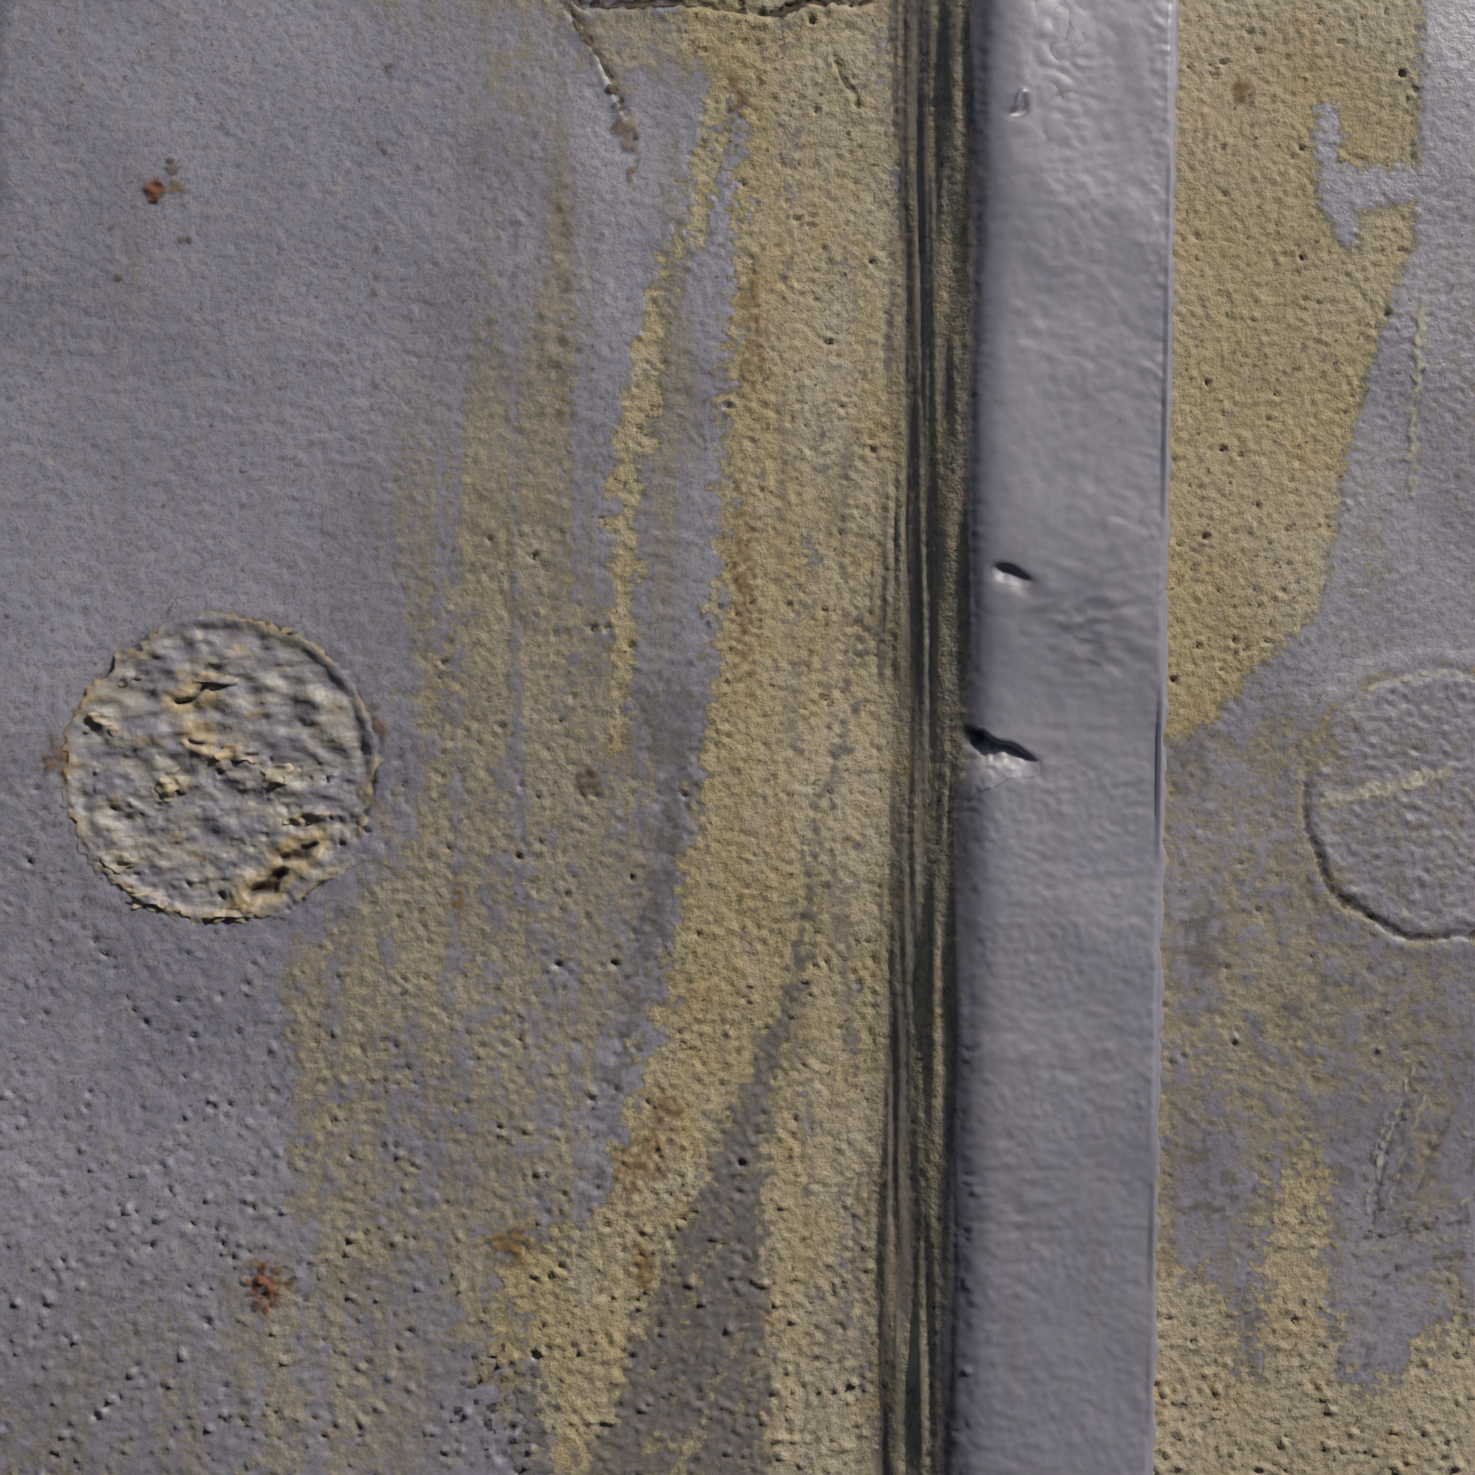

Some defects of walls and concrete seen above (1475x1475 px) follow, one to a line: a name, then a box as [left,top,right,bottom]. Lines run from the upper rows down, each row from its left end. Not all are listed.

peeling [47,0,1042,1475]
crack [563,0,873,115]
peeling [1153,0,1475,1475]